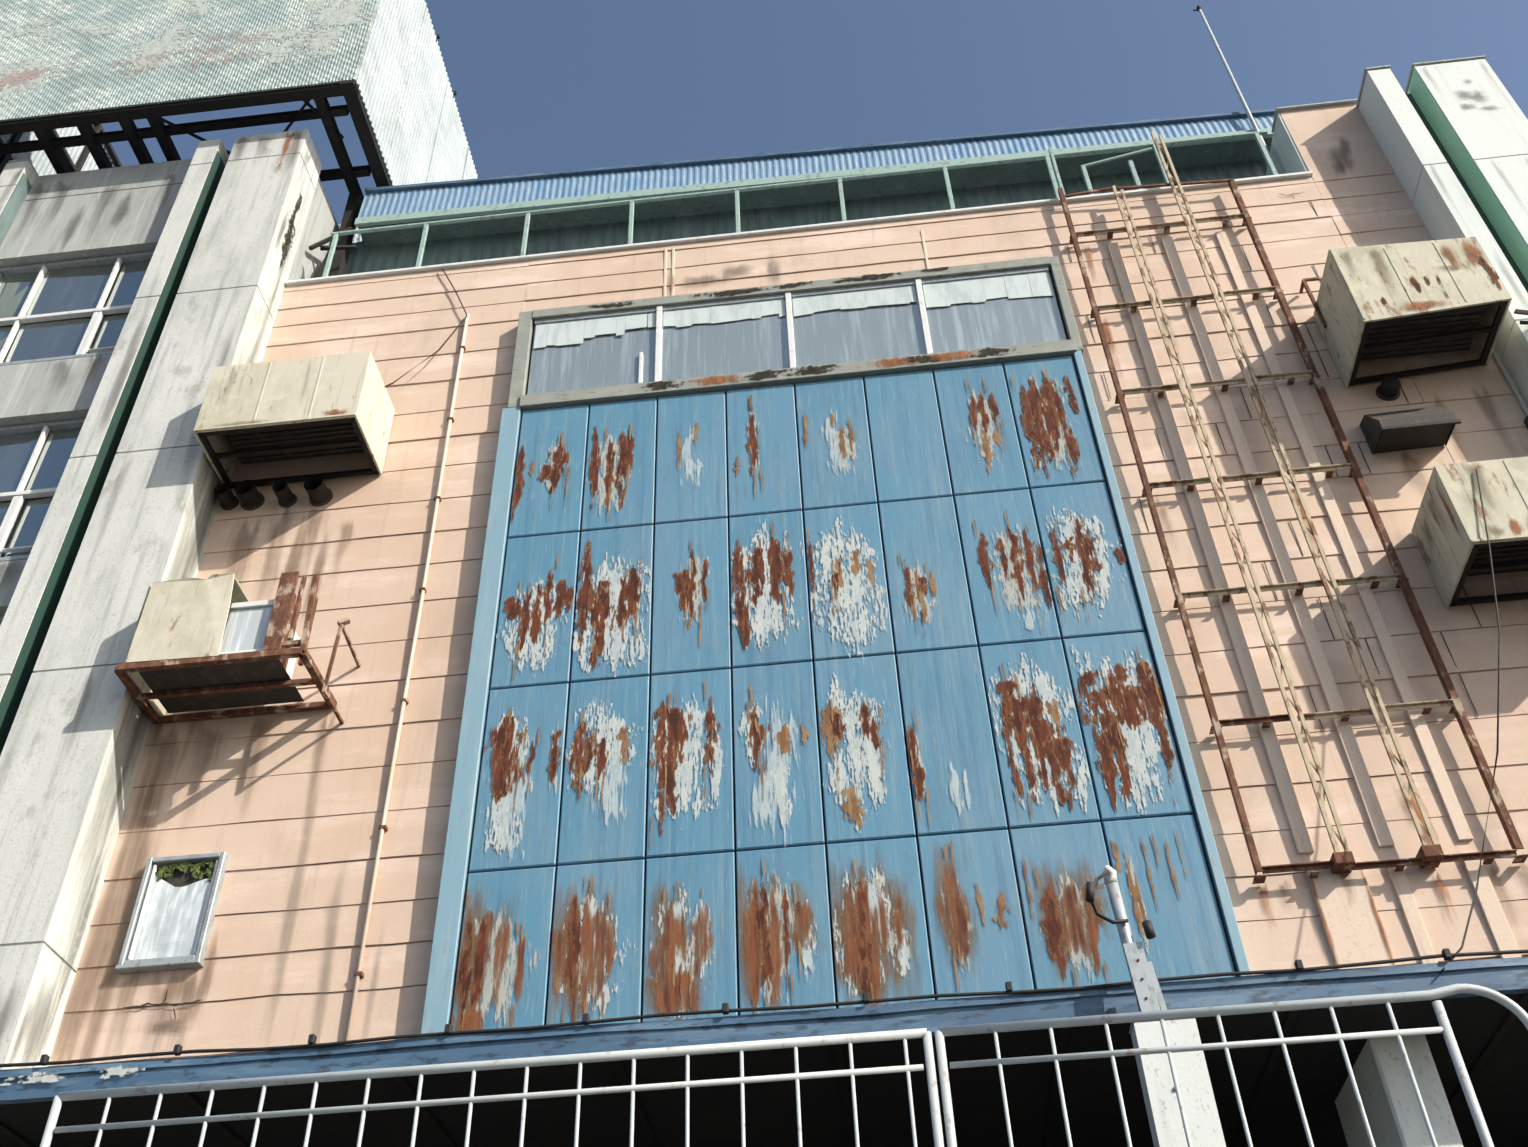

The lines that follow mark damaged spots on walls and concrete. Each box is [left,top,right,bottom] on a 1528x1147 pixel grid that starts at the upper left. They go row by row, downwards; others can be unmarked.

rust [496,539,651,683]
rust [673,539,711,648]
rust [731,515,937,664]
rust [974,506,1127,632]
rust [479,673,890,859]
rust [988,645,1178,819]
rust [451,875,715,1031]
rust [738,855,914,1014]
rust [936,841,1012,991]
rust [1023,859,1110,987]
peeling [0,1072,63,1086]
peeling [101,1065,145,1079]